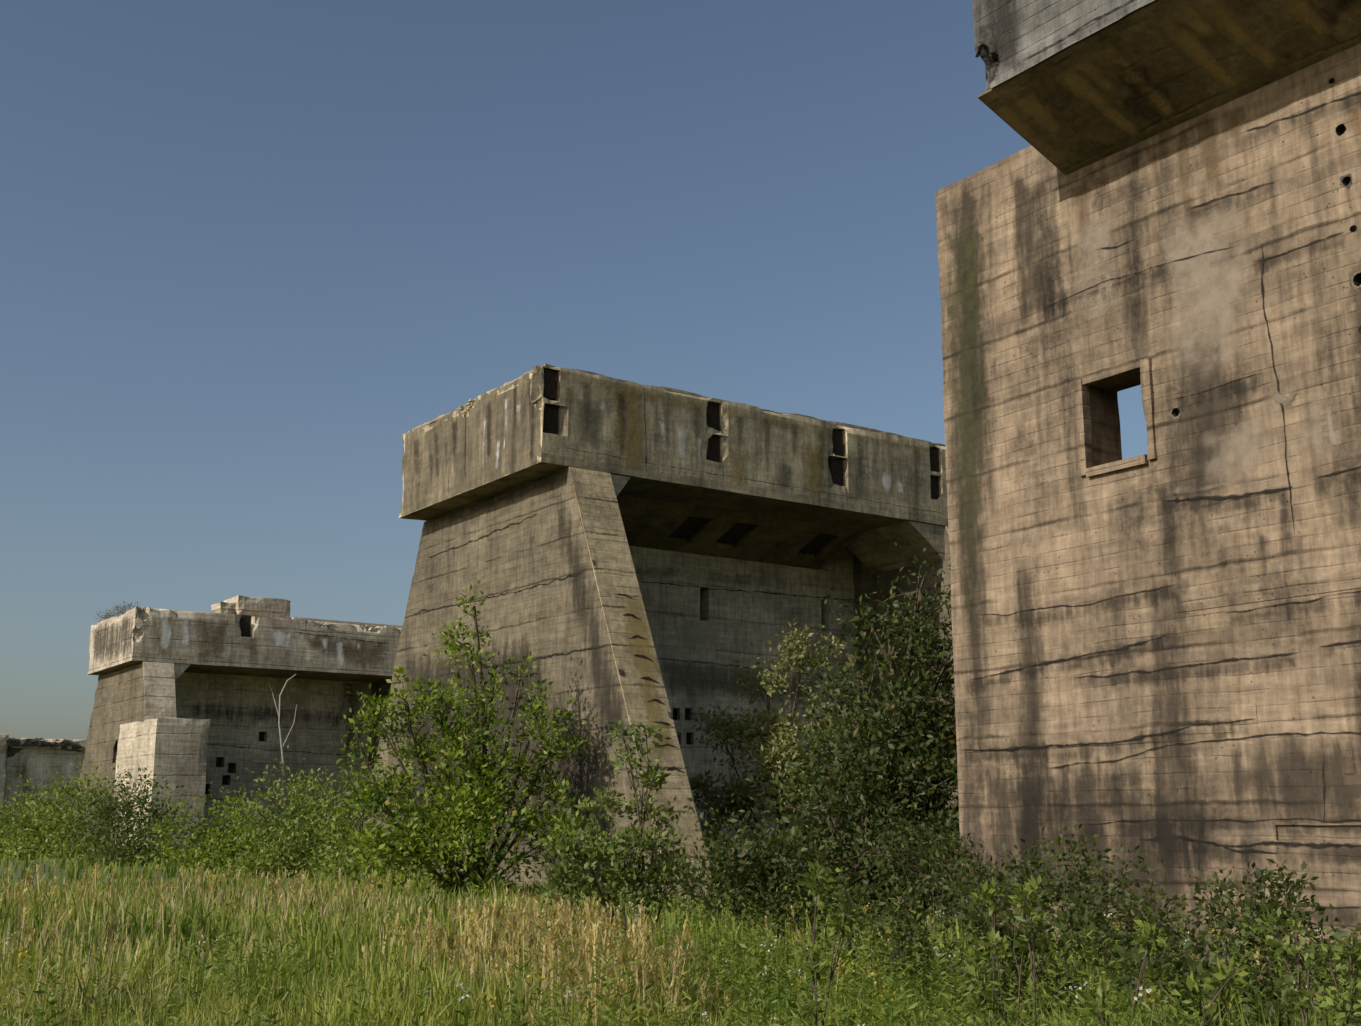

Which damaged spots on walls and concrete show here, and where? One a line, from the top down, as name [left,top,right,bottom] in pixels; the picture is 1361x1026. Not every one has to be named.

crack [1040,232,1361,528]
damp [882,474,903,493]
damp [952,192,990,704]
damp [1161,339,1240,571]
damp [94,621,132,660]
damp [161,616,224,657]
damp [273,631,383,667]
damp [969,576,1247,926]
damp [1234,745,1361,829]